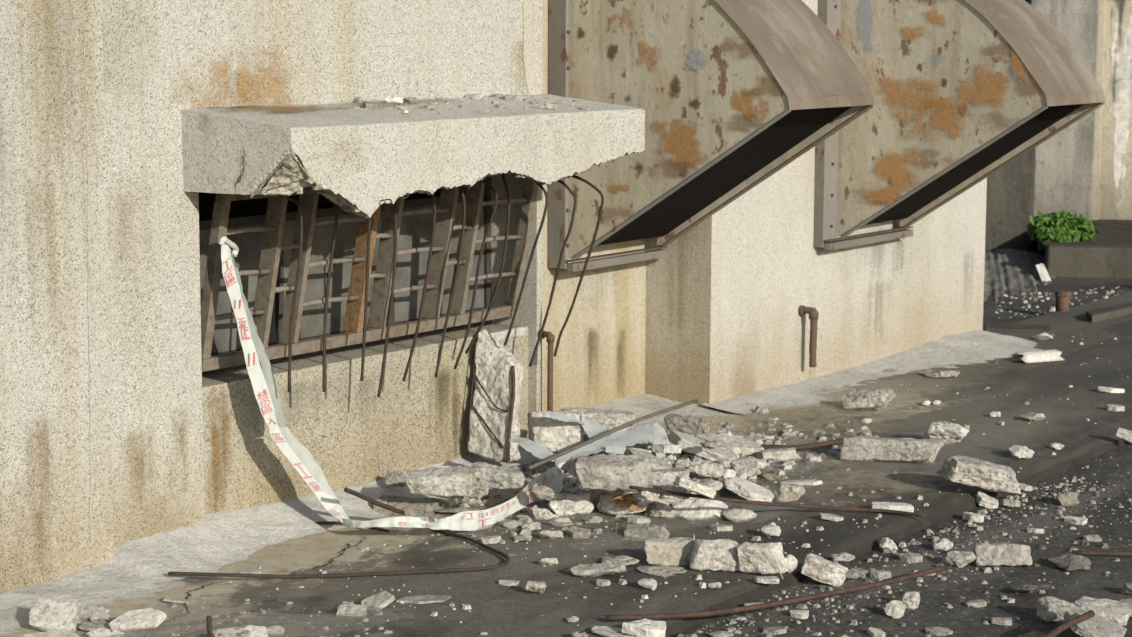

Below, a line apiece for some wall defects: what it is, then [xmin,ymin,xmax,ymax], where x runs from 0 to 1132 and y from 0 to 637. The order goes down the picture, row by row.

corrosion [607,8,632,59]
corrosion [902,11,946,41]
corrosion [651,119,706,168]
corrosion [670,76,699,108]
corrosion [732,89,768,121]
corrosion [859,49,1028,203]
crack [234,146,308,195]
spalling [250,152,639,397]